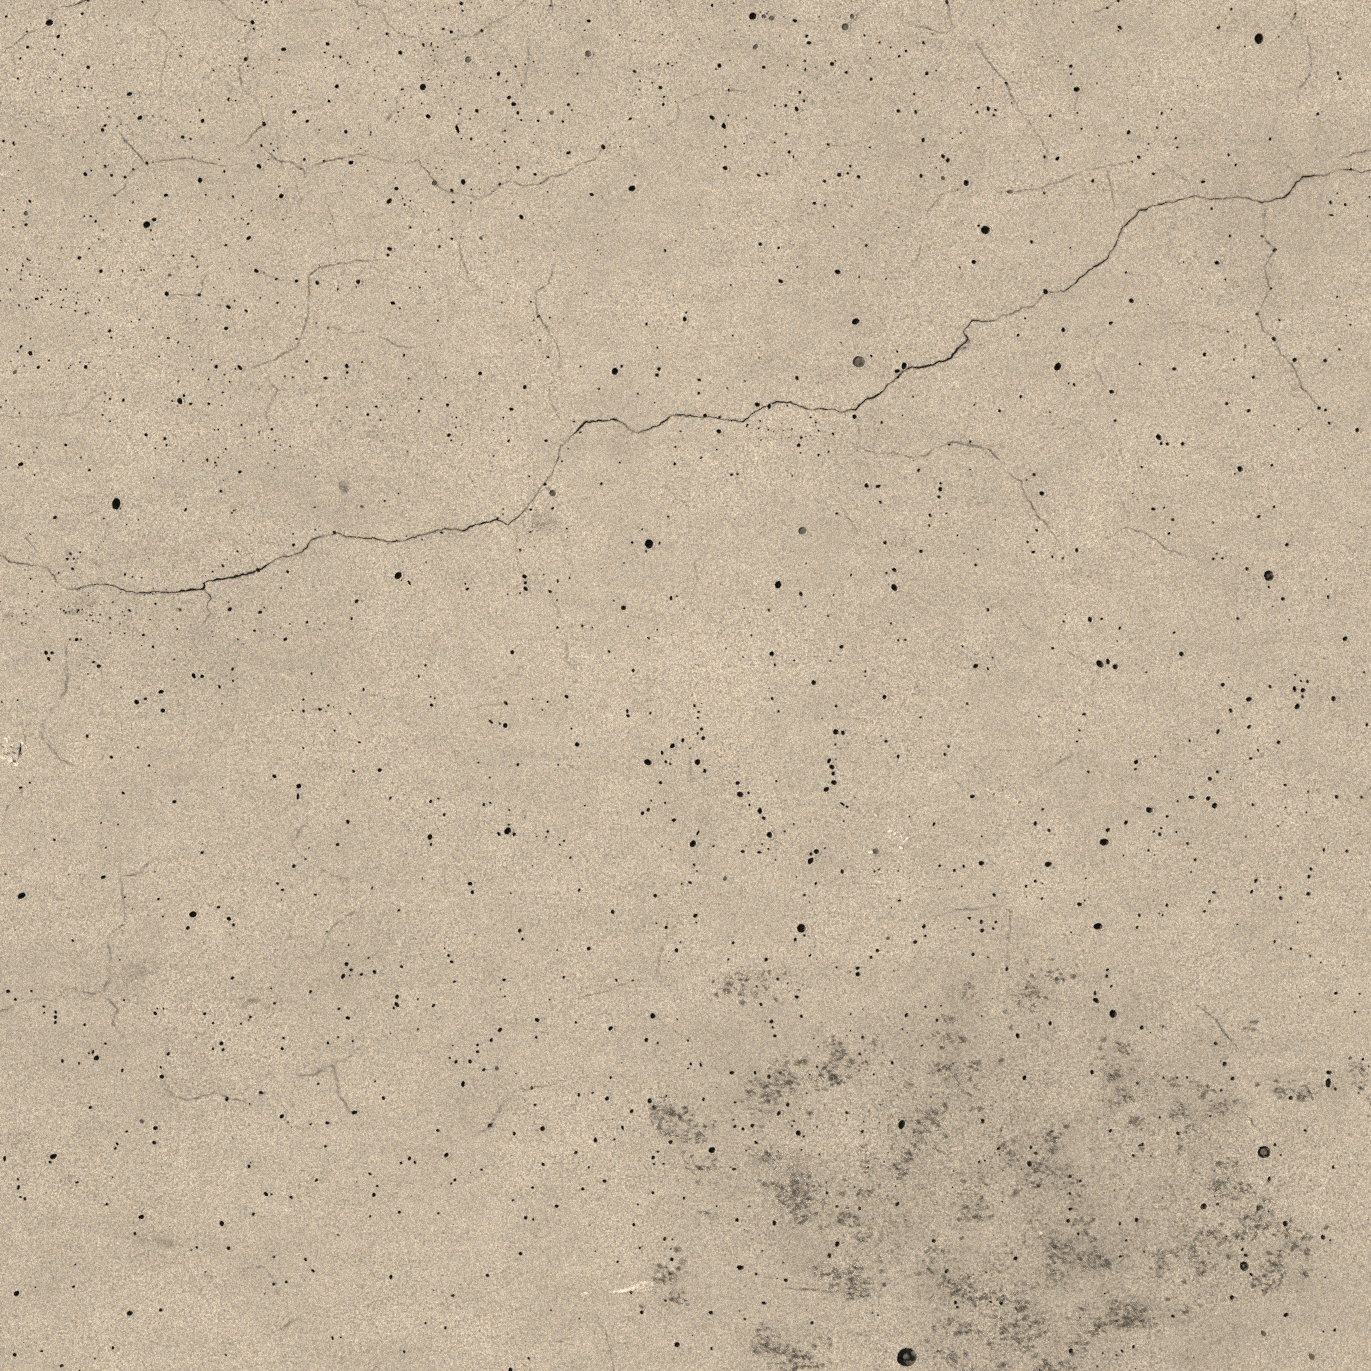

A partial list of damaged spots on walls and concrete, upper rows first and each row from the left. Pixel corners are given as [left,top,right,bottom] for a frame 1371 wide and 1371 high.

crack [2,153,1371,617]
leakage [741,1036,875,1103]
leakage [653,1106,716,1169]
leakage [1002,1124,1068,1196]
leakage [762,1173,817,1223]
leakage [636,1247,689,1308]
mould [928,1237,1154,1371]
mould [1181,1200,1328,1296]
leakage [751,1323,830,1371]